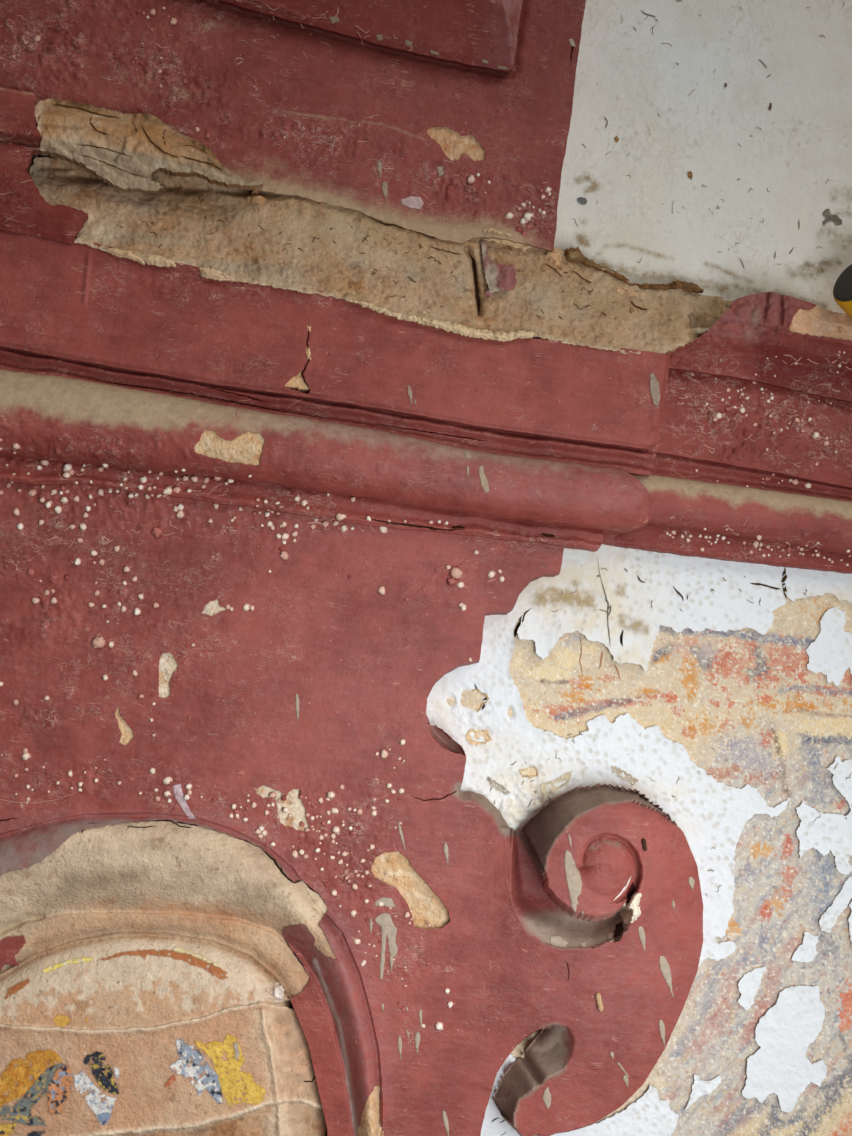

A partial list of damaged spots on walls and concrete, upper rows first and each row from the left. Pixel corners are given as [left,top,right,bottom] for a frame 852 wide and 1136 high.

spalling [29,73,263,194]
peeling [194,429,265,466]
crack [579,557,645,678]
peeling [426,537,852,967]
peeling [253,785,333,832]
peeling [0,821,336,1004]
peeling [341,845,450,930]
peeling [738,966,766,1010]
peeling [742,985,827,1114]
peeling [356,1086,384,1136]
peeling [480,1054,520,1136]
peeling [551,1075,721,1136]